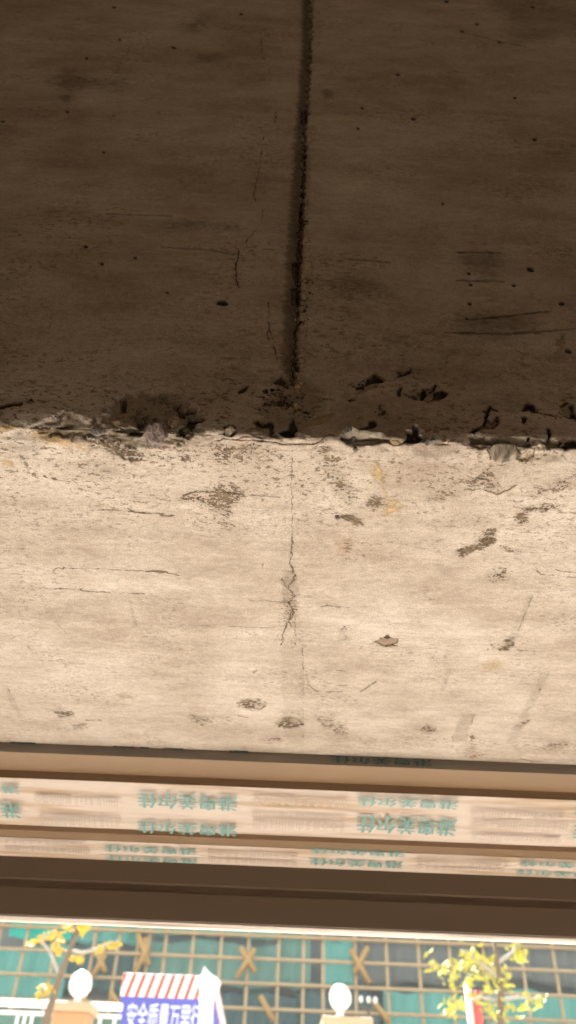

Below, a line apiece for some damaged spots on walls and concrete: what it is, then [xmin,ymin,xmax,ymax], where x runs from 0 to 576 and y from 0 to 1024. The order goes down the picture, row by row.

spalling [348,375,384,402]
spalling [397,370,448,402]
spalling [36,397,283,465]
spalling [341,405,450,452]
flaking render [428,403,576,502]
peeling [182,485,243,527]
crack [217,434,334,645]
peeling [457,528,519,557]
spalling [375,635,398,647]